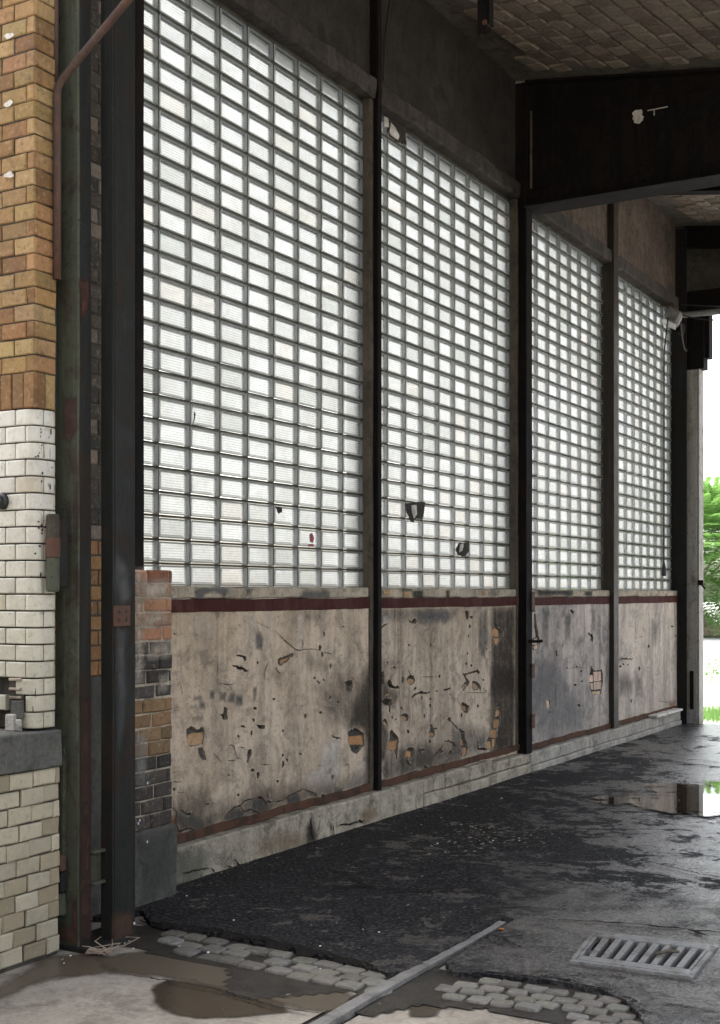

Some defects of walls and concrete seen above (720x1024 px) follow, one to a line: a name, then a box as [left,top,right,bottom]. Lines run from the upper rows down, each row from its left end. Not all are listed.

crack [258,623,335,658]
spalling [186,726,207,760]
peeling [307,727,364,795]
spalling [382,652,500,771]
leakage [457,608,514,752]
spalling [566,666,603,695]